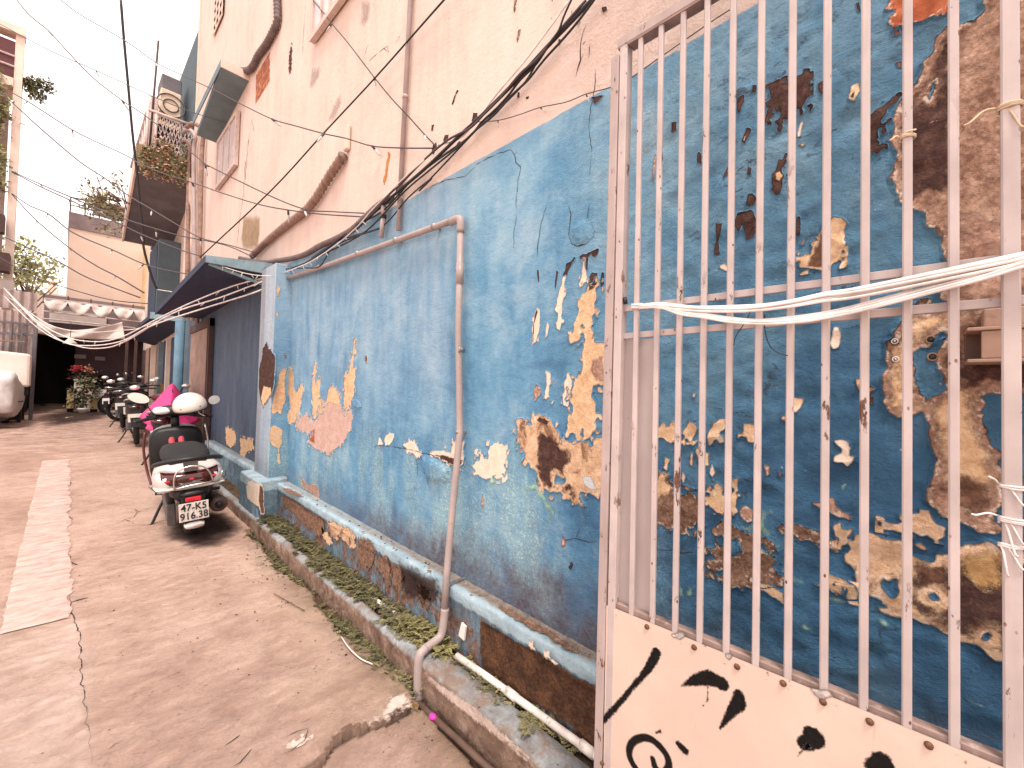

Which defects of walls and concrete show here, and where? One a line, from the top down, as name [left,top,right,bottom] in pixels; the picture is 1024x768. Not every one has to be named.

peeling [736,67,823,148]
spalling [870,0,1001,262]
crack [432,150,589,254]
peeling [795,215,851,276]
peeling [259,337,368,465]
peeling [377,248,605,509]
spalling [246,480,265,515]
spalling [282,475,405,591]
spalling [657,276,1002,664]
crack [69,595,117,750]